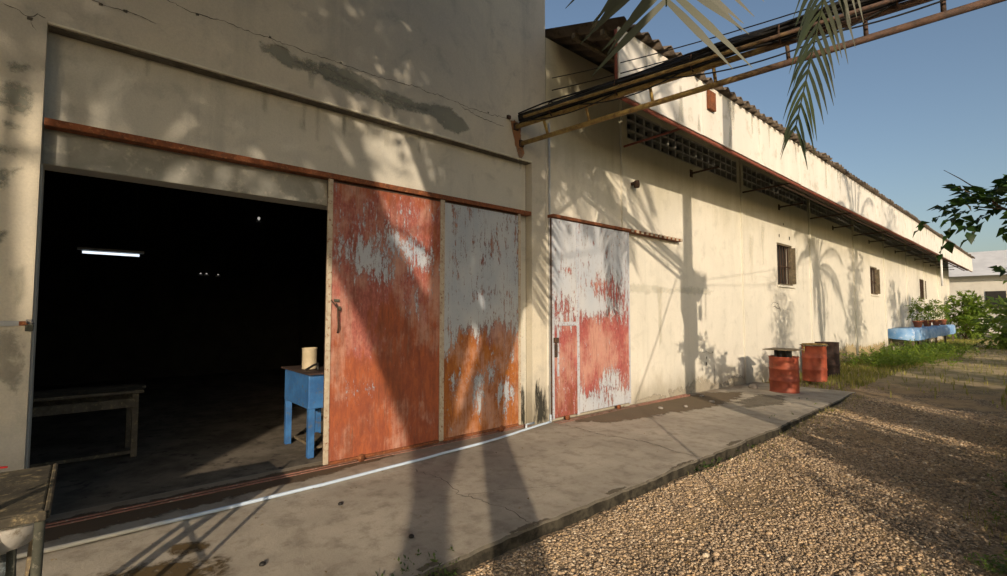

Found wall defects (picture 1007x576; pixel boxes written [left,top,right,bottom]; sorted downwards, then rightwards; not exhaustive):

crack [168,0,507,127]
damp [104,542,229,576]